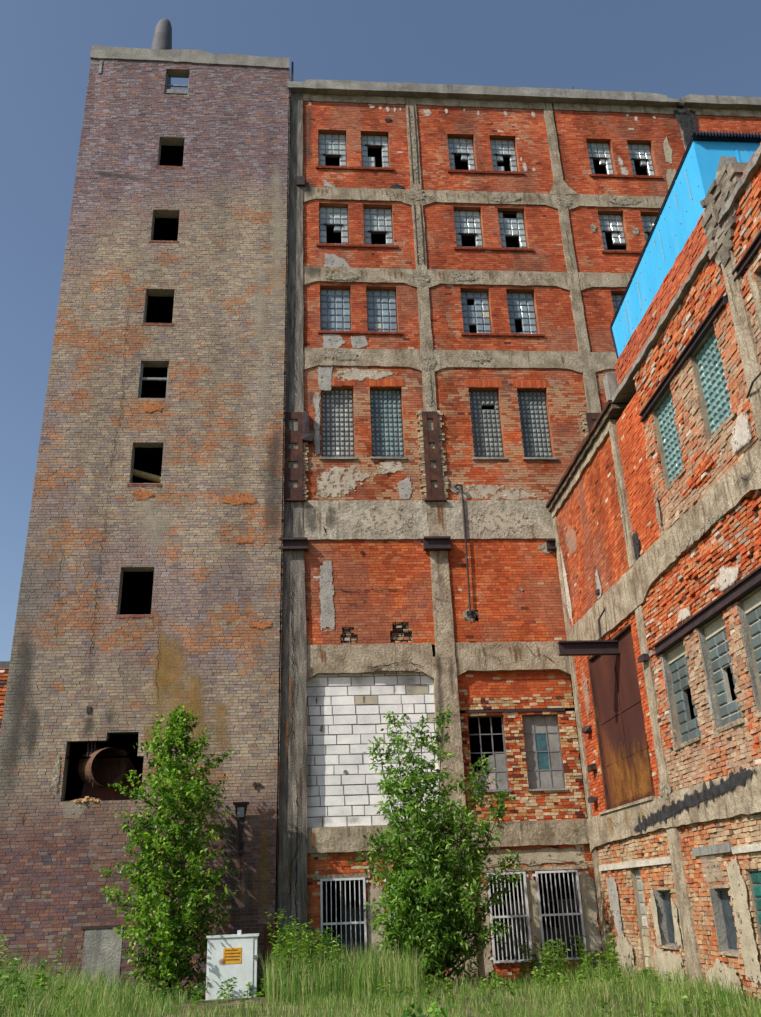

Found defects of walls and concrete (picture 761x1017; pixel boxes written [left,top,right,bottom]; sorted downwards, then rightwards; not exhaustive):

leakage [674,109,697,146]
flaking render [663,137,676,189]
spalling [303,334,538,536]
flaking render [731,414,751,453]
flaking render [714,565,738,590]
leakage [9,644,35,763]
leakage [638,766,745,835]